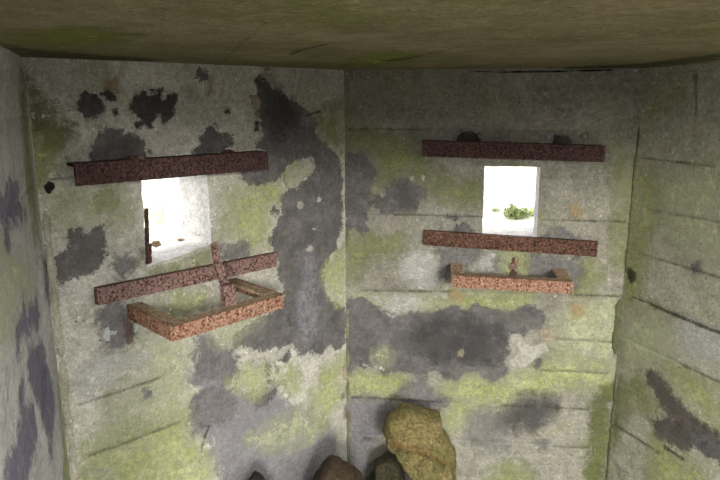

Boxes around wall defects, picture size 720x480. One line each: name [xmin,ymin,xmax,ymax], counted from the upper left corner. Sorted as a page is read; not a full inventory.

leakage [76,89,119,119]
leakage [88,87,178,161]
leakage [0,176,26,253]
leakage [43,225,146,304]
leakage [189,76,545,480]
leakage [3,297,55,480]
leakage [646,369,720,466]